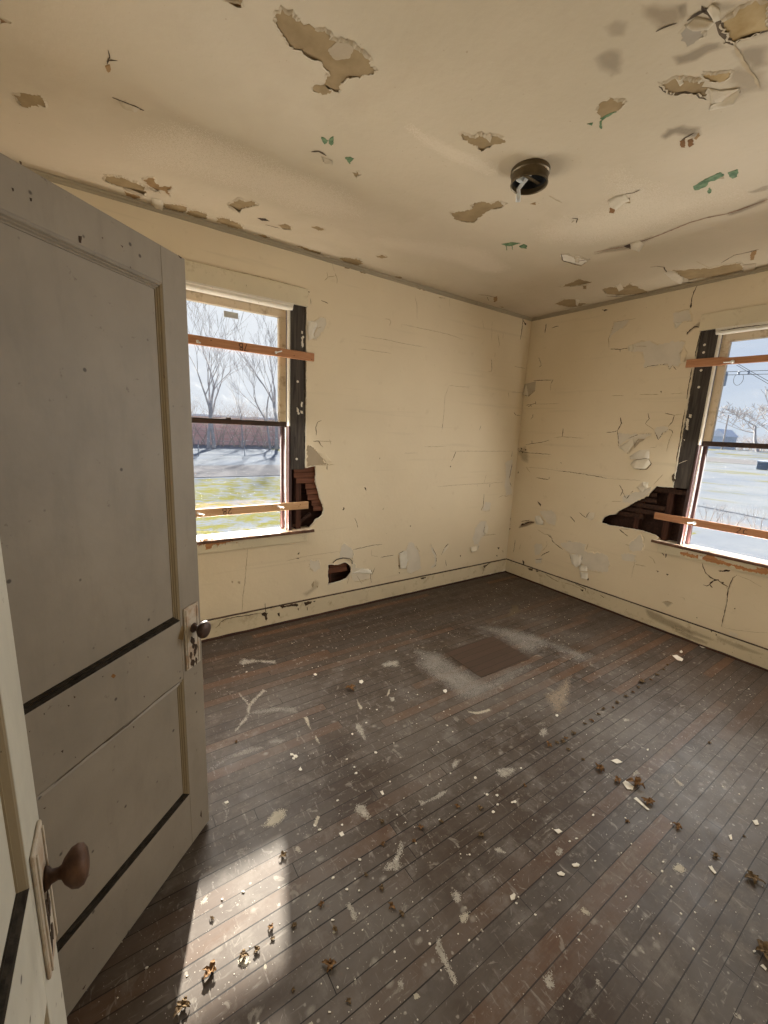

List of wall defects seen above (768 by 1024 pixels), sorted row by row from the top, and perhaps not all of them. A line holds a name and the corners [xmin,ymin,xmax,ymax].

peeling [273,5,379,95]
peeling [11,92,48,109]
peeling [588,98,627,129]
peeling [658,69,740,111]
peeling [458,131,505,152]
peeling [102,174,293,238]
peeling [449,201,508,223]
crack [597,199,768,252]
peeling [201,263,333,529]
peeling [600,331,701,540]
peeling [327,558,375,585]
crack [702,564,765,633]